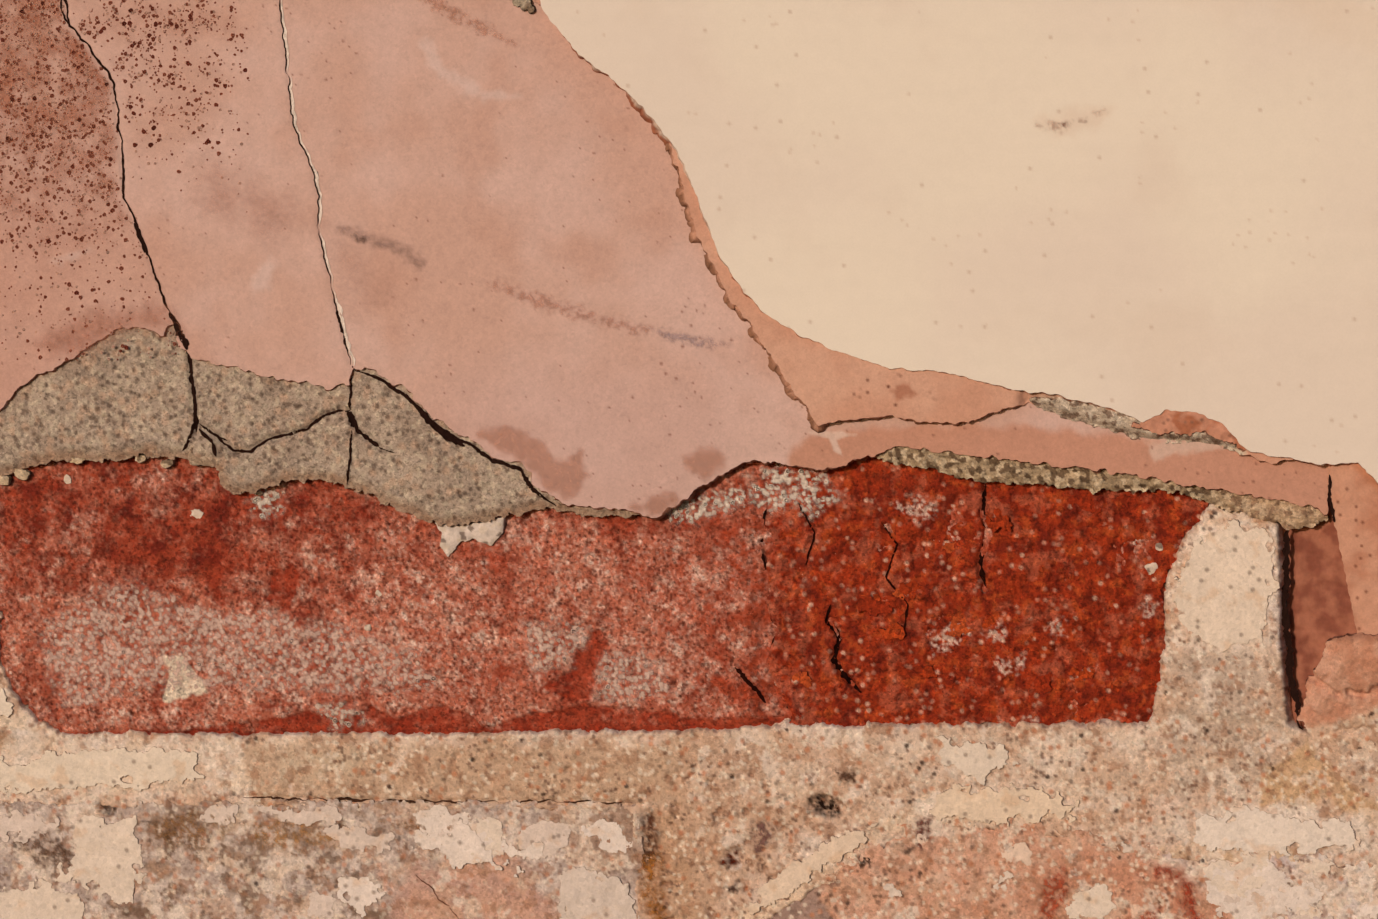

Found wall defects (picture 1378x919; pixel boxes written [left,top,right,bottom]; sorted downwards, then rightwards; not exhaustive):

crack [60,0,556,506]
flaking render [665,143,1293,465]
spalling [0,325,639,557]
crack [760,477,815,569]
crack [881,522,909,628]
crack [978,484,992,586]
crack [735,667,788,708]
crack [825,604,862,693]
spalling [754,446,1378,826]
peeling [0,746,205,919]
peeling [412,804,633,877]
peeling [1193,804,1361,919]